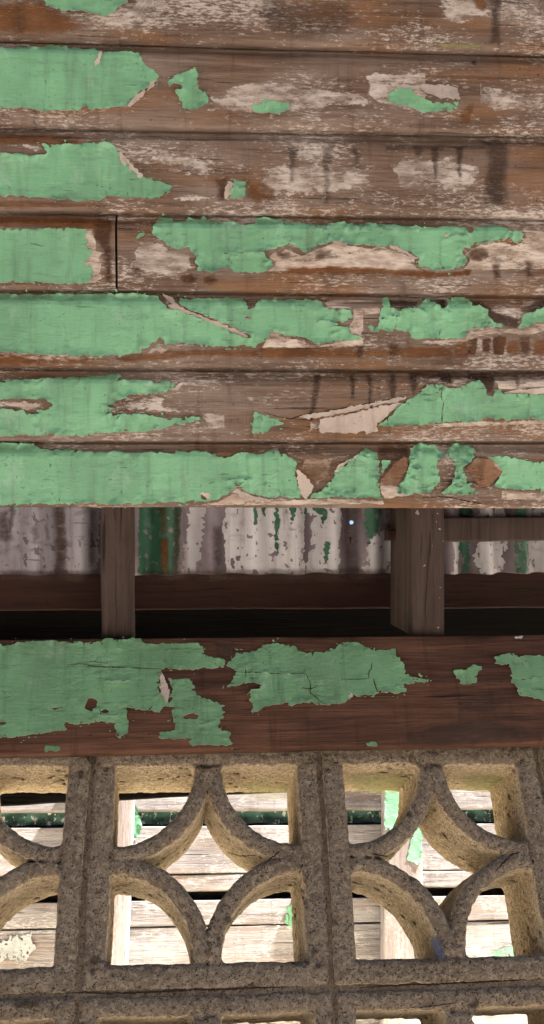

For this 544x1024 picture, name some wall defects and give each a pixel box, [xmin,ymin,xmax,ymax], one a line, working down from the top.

peeling [44,0,164,20]
peeling [439,0,492,24]
peeling [0,44,461,116]
peeling [480,83,541,111]
damp [387,143,506,203]
peeling [0,139,544,275]
peeling [0,227,544,575]
peeling [0,637,432,752]
peeling [453,664,482,684]
peeling [494,653,544,701]